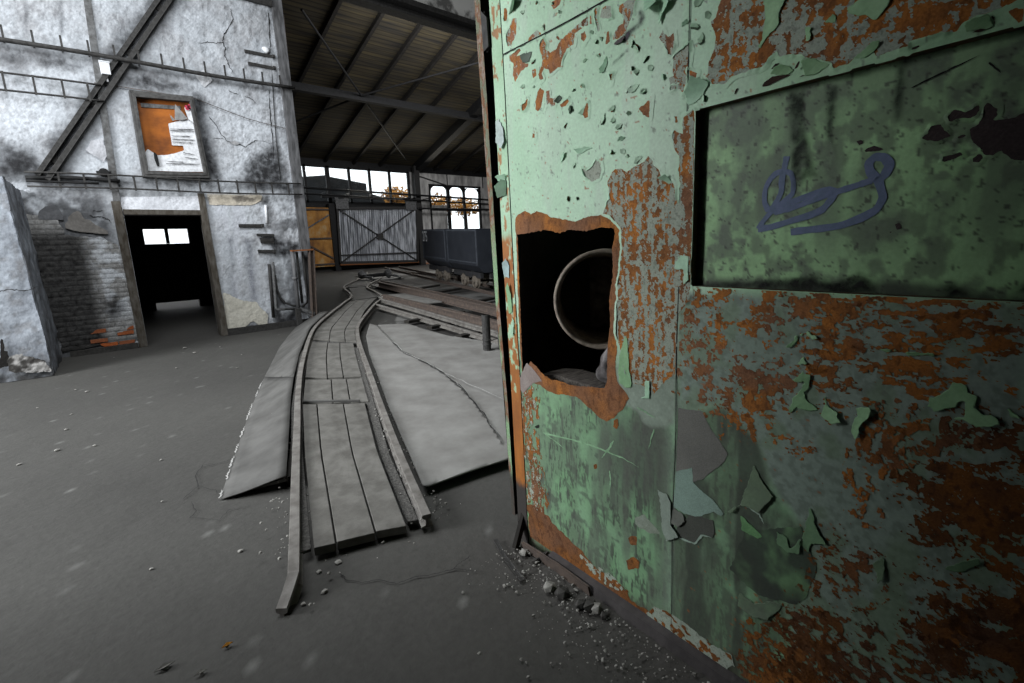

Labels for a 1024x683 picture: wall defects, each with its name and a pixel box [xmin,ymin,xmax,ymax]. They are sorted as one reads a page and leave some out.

crack [203,9,274,159]
peeling [572,105,642,186]
peeling [505,0,712,128]
rust [703,0,1024,91]
spalling [26,205,138,353]
spalling [0,339,52,373]
rust [515,100,1024,683]
peeling [635,466,826,605]